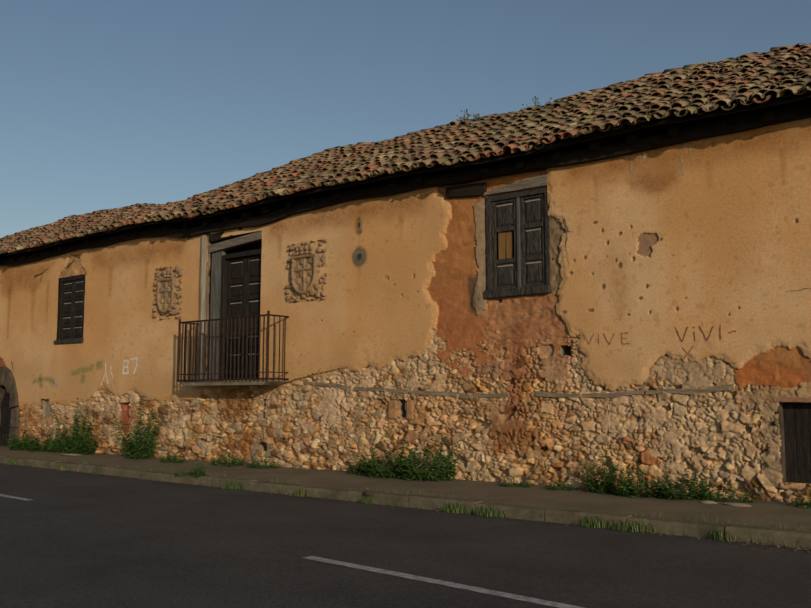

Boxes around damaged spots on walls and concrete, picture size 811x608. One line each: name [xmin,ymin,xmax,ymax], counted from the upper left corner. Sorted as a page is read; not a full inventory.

spalling [15,169,811,502]